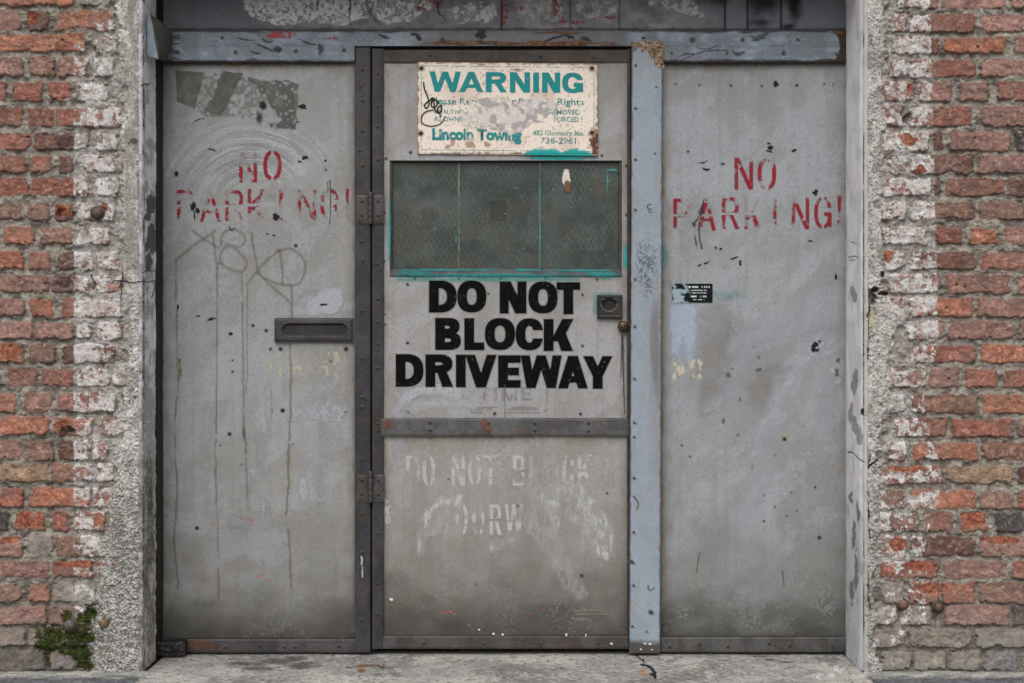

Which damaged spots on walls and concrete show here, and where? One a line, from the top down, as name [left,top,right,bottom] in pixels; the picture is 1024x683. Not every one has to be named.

peeling [244,0,432,41]
peeling [447,2,497,40]
peeling [516,0,591,47]
peeling [649,0,704,17]
corrosion [632,40,665,68]
peeling [848,0,948,656]